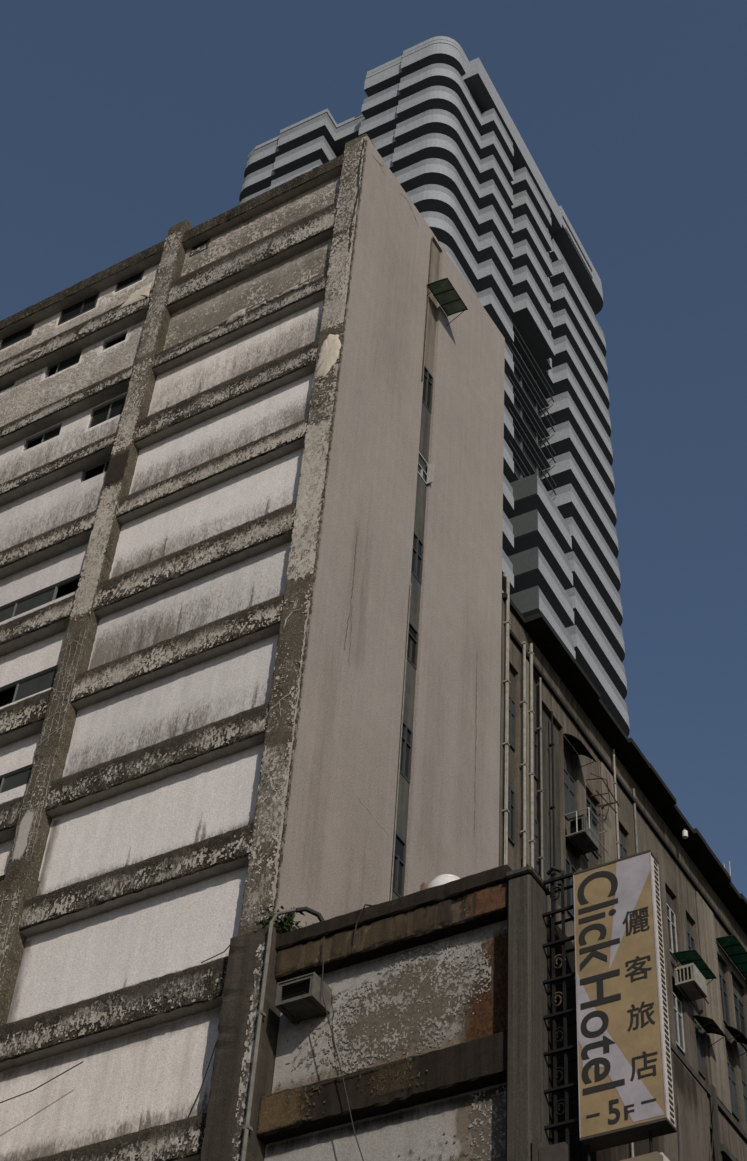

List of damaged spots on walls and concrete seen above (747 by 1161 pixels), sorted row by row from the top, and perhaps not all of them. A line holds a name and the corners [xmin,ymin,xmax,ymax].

peeling [0,136,368,967]
water stain [50,691,268,791]
peeling [0,968,226,1057]
water stain [276,899,452,972]
peeling [232,941,506,1161]
corrosion [458,929,507,1042]
peeling [70,1124,205,1161]